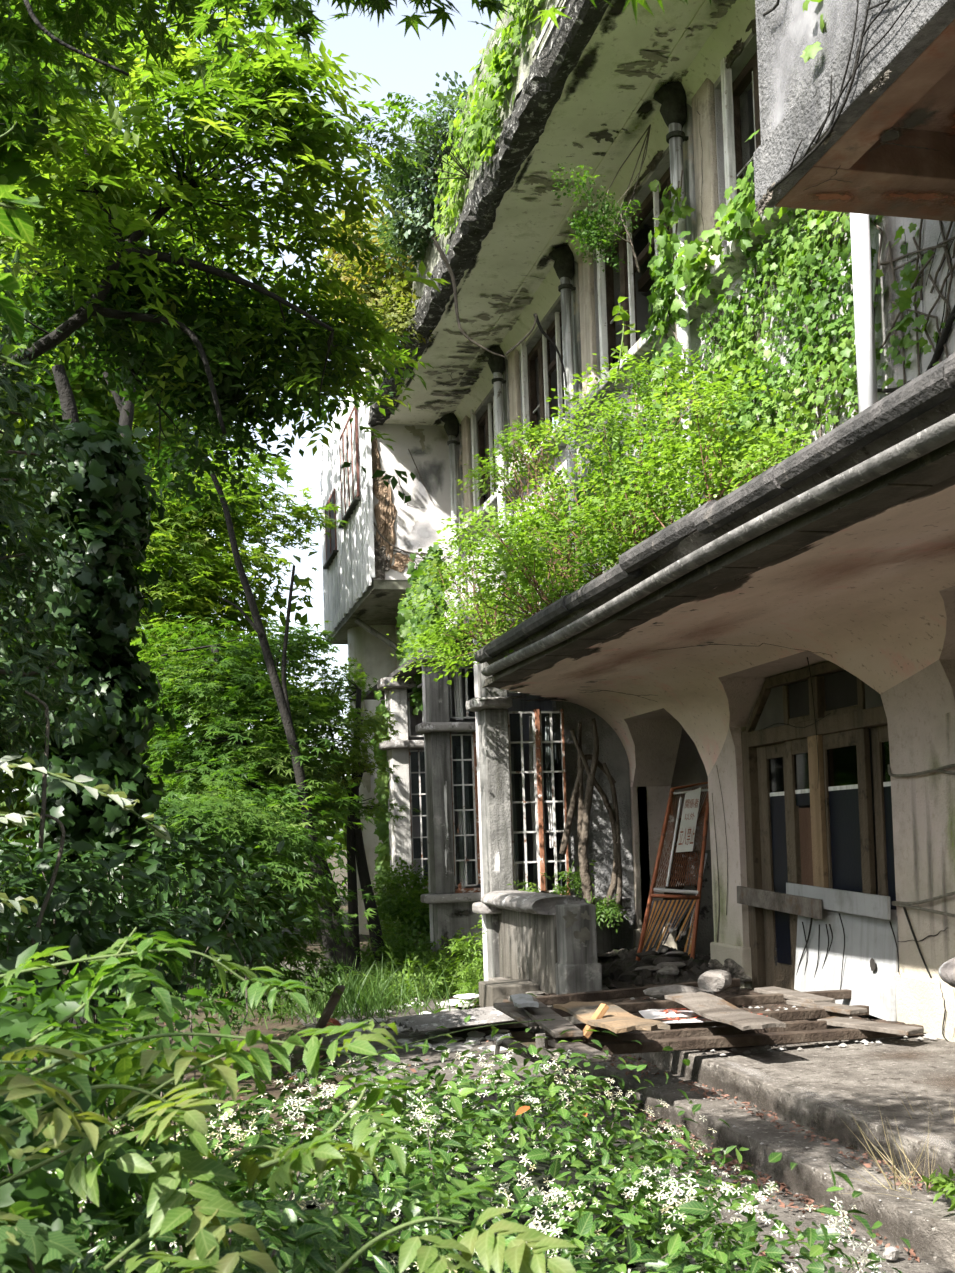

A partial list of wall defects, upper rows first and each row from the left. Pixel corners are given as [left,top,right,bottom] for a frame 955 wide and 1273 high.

water stain [564,0,626,101]
water stain [630,100,653,133]
water stain [515,155,532,184]
water stain [538,243,568,269]
water stain [413,447,441,497]
spalling [371,433,415,580]
water stain [828,476,955,536]
water stain [404,526,434,548]
water stain [685,545,816,603]
water stain [478,609,670,701]